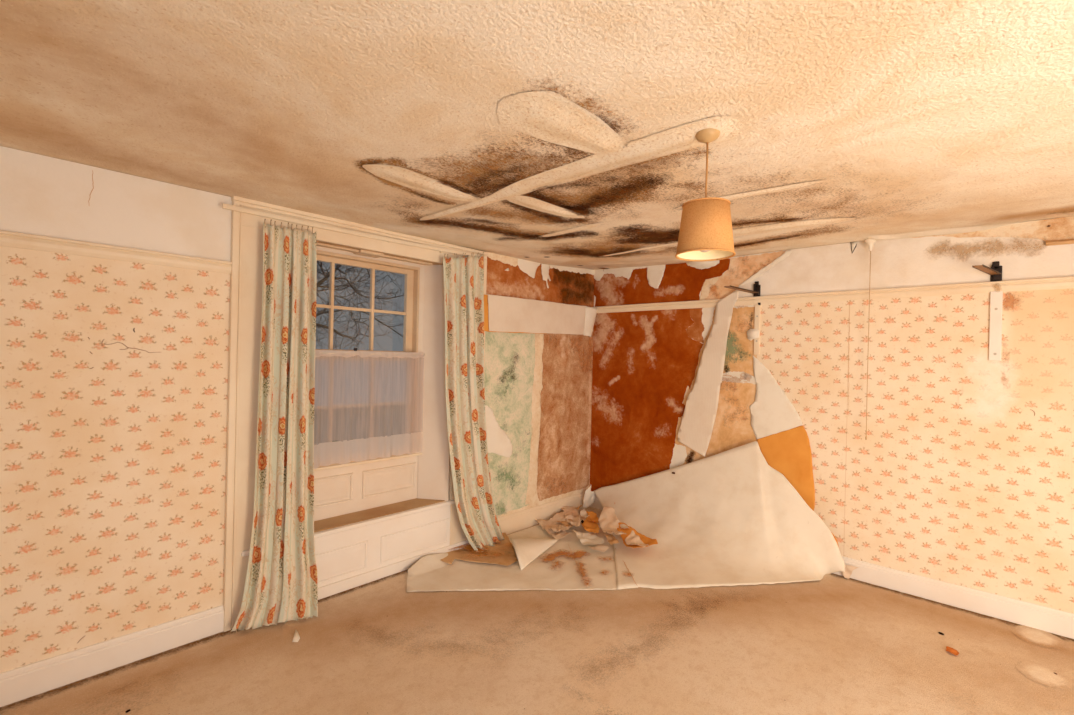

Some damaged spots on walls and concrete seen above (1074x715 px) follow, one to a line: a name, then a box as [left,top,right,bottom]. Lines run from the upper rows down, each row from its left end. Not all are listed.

leakage [532,81,632,133]
leakage [356,137,714,258]
leakage [732,174,866,249]
leakage [932,241,1044,255]
flaking render [912,216,1074,242]
flaking render [484,251,785,515]